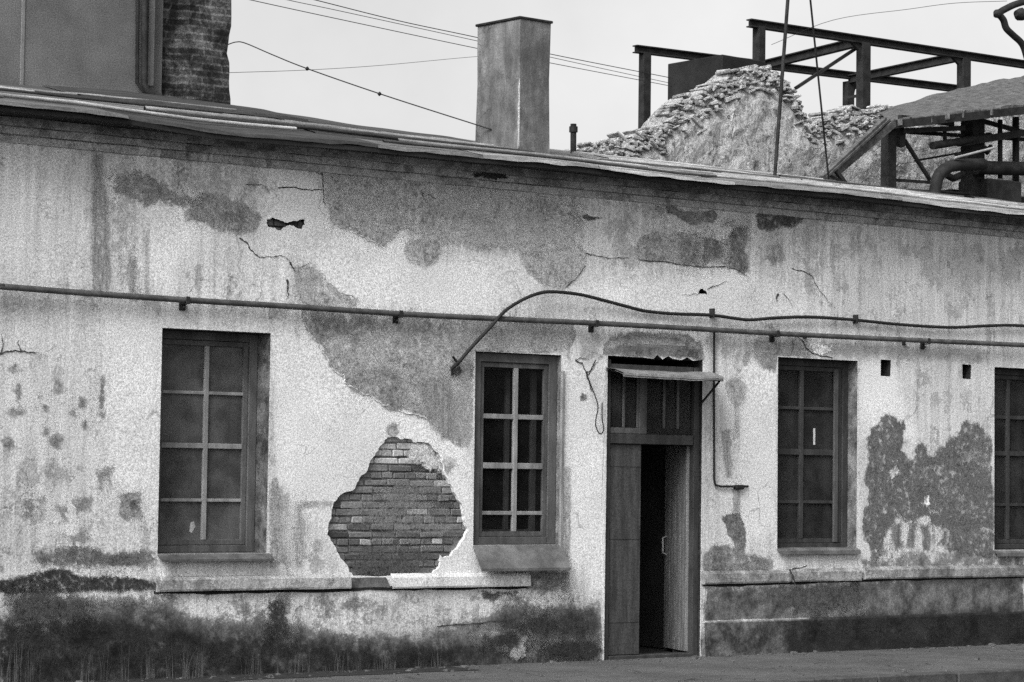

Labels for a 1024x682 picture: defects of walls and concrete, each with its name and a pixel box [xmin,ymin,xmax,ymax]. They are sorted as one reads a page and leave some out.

peeling [113,168,303,236]
crack [239,237,309,298]
crack [246,172,325,203]
peeling [323,172,602,256]
peeling [636,206,809,273]
flaking render [293,265,576,588]
damp [21,466,114,521]
damp [69,529,91,545]
damp [0,585,464,682]
damp [483,607,602,659]
damp [782,609,1024,645]